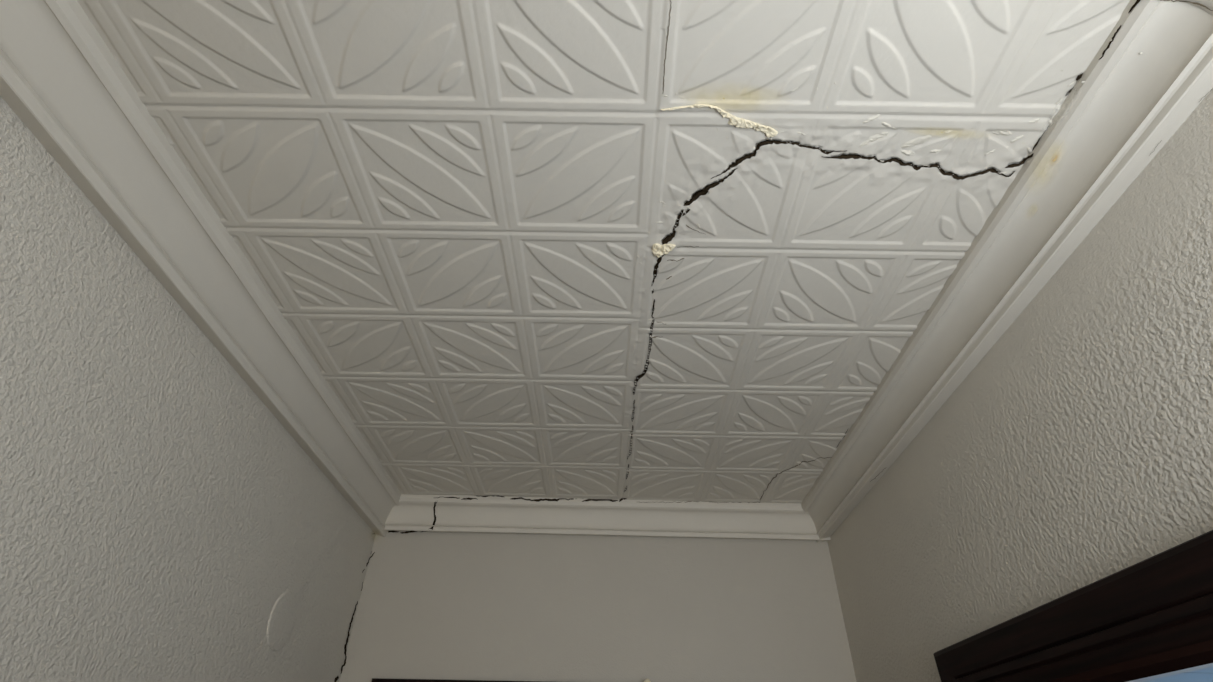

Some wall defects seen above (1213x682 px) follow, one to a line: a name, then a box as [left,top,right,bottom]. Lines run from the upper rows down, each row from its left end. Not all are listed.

crack [334,0,1213,682]